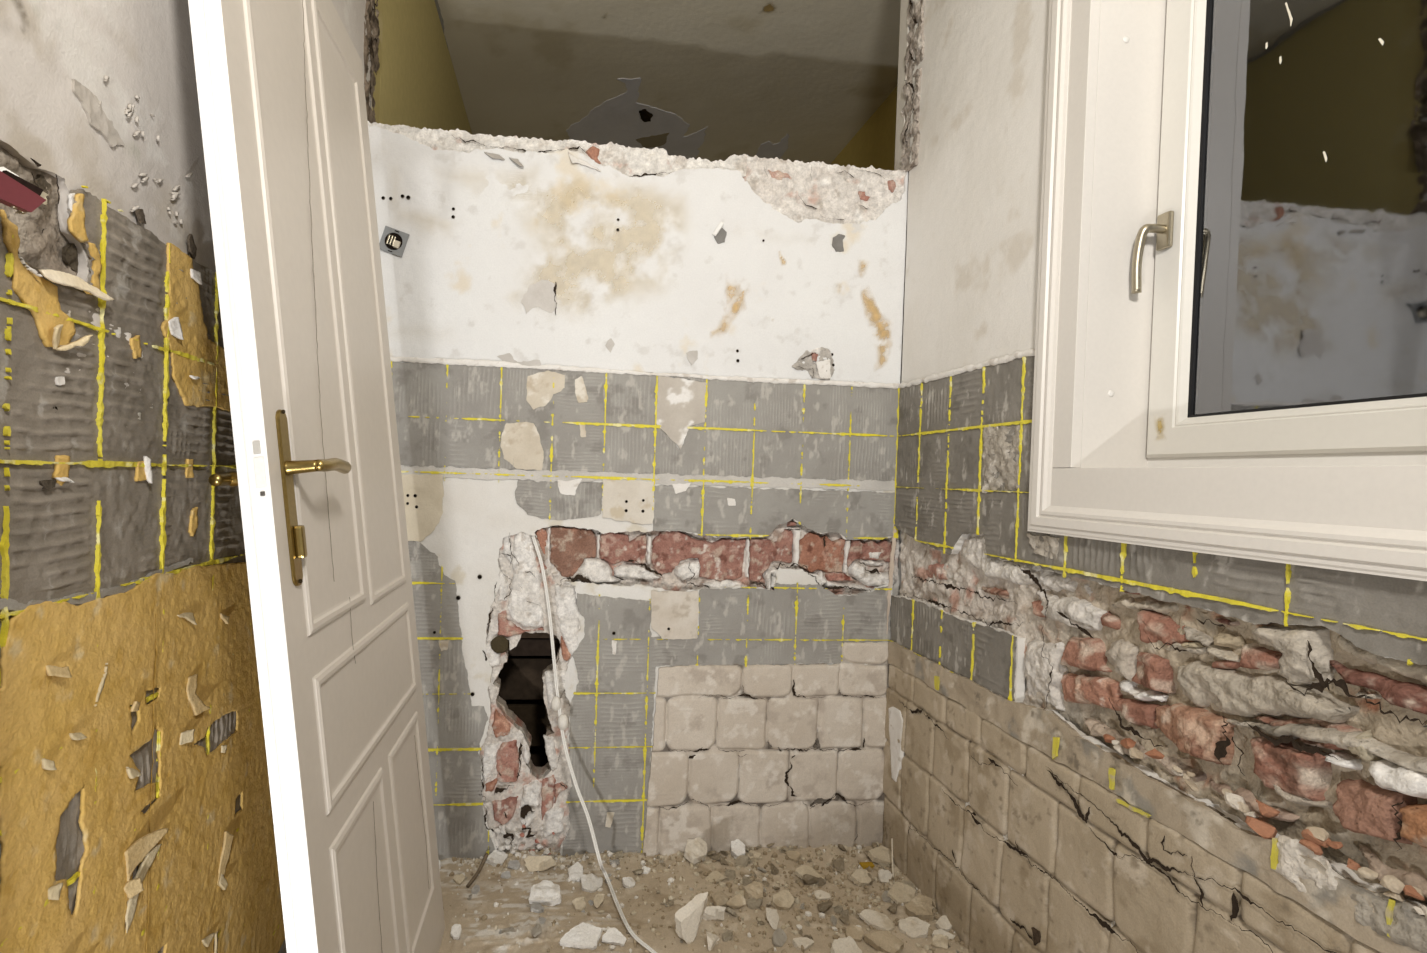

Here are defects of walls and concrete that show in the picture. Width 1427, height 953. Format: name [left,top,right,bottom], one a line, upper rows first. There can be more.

spalling [363,0,926,224]
spalling [0,146,114,301]
peeling [143,456,153,483]
peeling [500,370,588,470]
peeling [656,376,707,449]
spalling [529,746,549,767]
crack [699,678,1016,785]
spalling [535,478,1427,953]
peeling [124,828,169,933]
crack [908,824,983,897]
crack [942,789,1138,953]
crack [1046,766,1336,953]